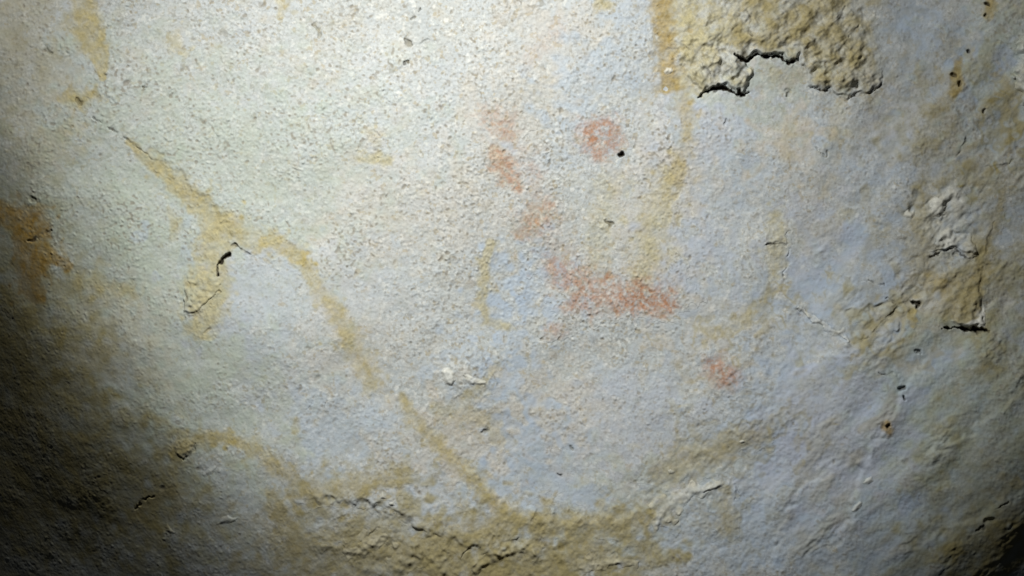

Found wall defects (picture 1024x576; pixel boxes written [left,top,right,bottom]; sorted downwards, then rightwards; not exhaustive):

water stain [347,111,396,172]
crack [181,242,257,322]
peeling [929,196,986,327]
water stain [121,136,777,576]
crack [352,501,431,548]
crack [502,508,539,546]